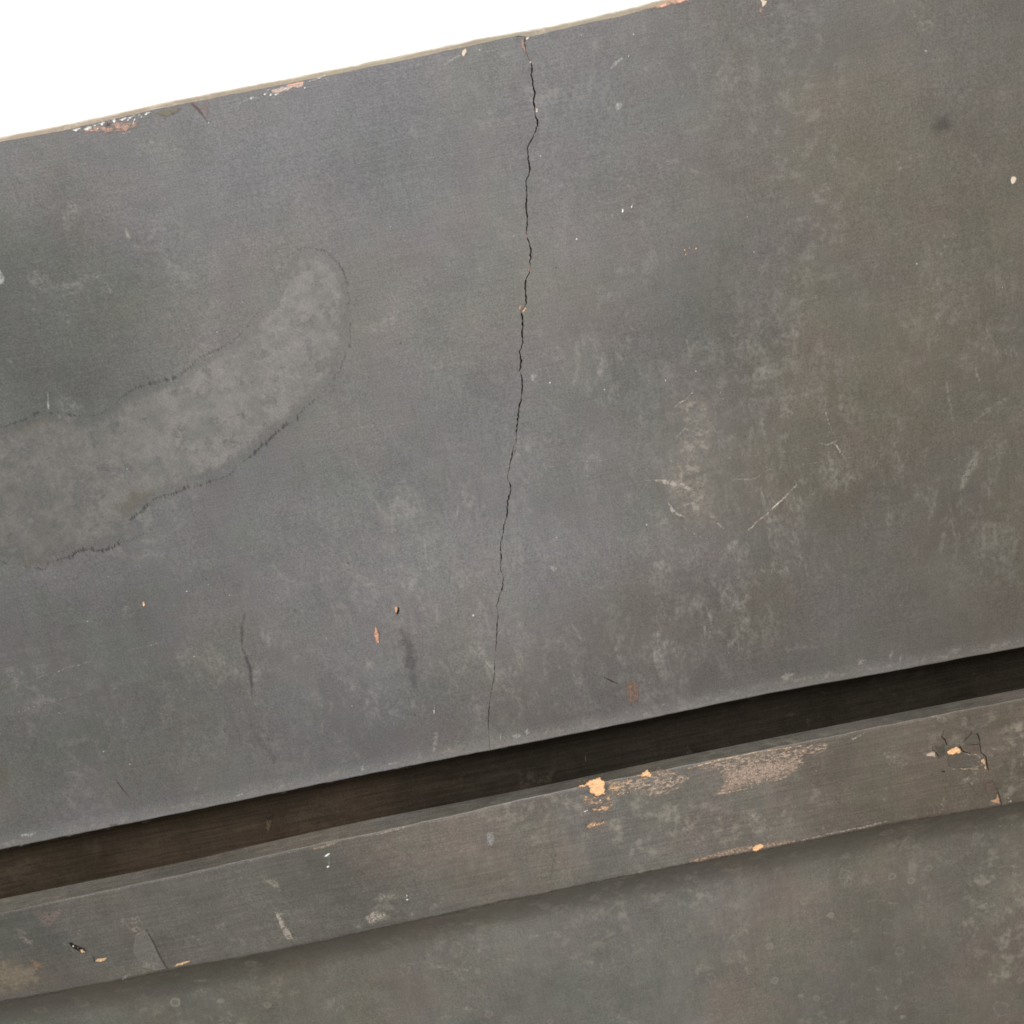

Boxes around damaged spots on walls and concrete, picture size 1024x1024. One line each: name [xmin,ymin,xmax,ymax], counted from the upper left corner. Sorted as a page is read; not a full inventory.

spalling [250,75,325,99]
spalling [73,103,205,133]
damp [0,257,343,560]
crack [488,37,538,747]
peeling [926,731,1002,805]
peeling [578,769,688,828]
peeling [69,943,107,962]